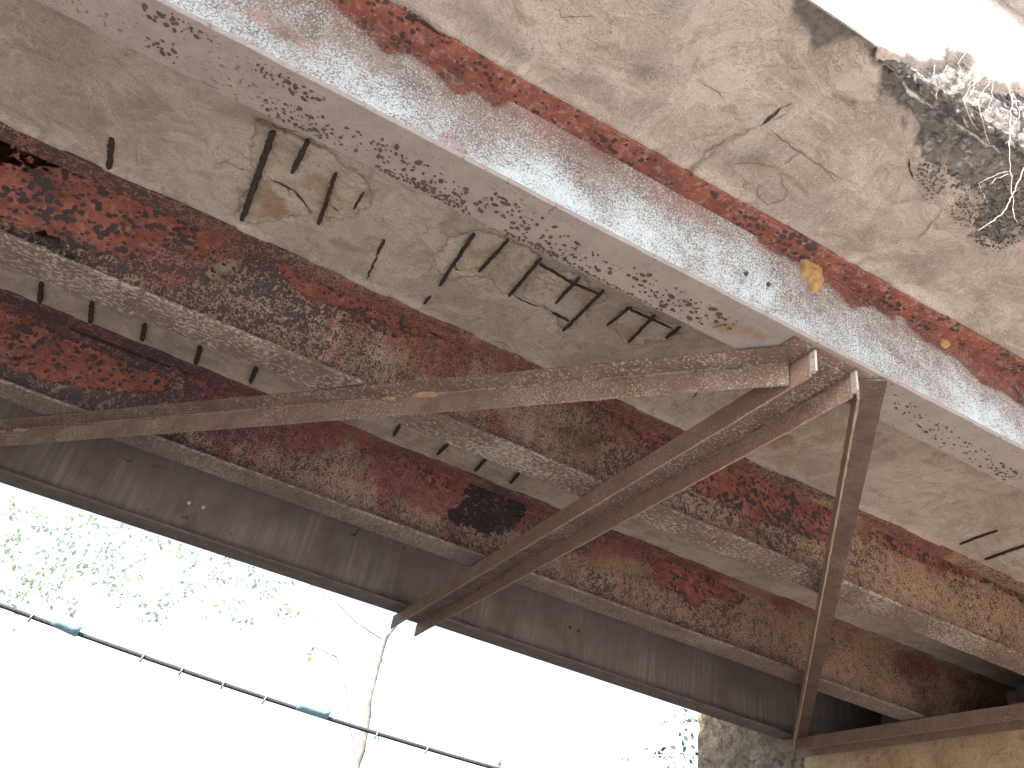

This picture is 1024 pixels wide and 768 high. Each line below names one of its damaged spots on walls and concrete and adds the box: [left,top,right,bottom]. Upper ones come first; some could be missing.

damp [403,6,446,37]
damp [795,0,860,48]
spalling [235,120,371,225]
corrosion [252,64,738,330]
spalling [873,52,1024,242]
mould [915,163,1024,252]
spalling [423,230,607,332]
spalling [606,306,681,344]
corrosion [893,394,1021,480]